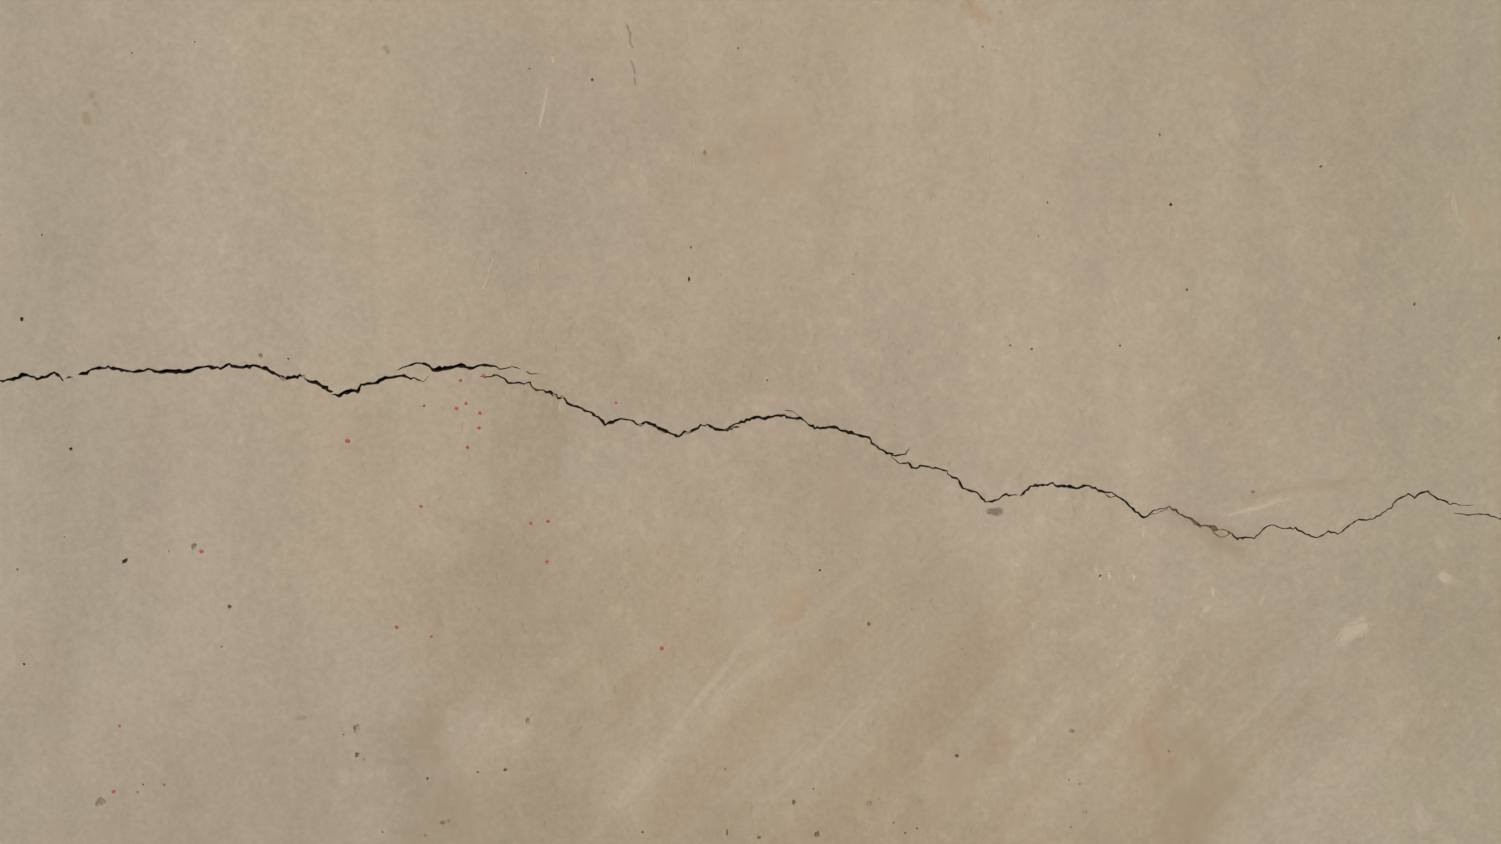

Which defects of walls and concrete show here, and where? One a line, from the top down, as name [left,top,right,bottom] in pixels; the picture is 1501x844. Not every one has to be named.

crack [0,362,1501,541]